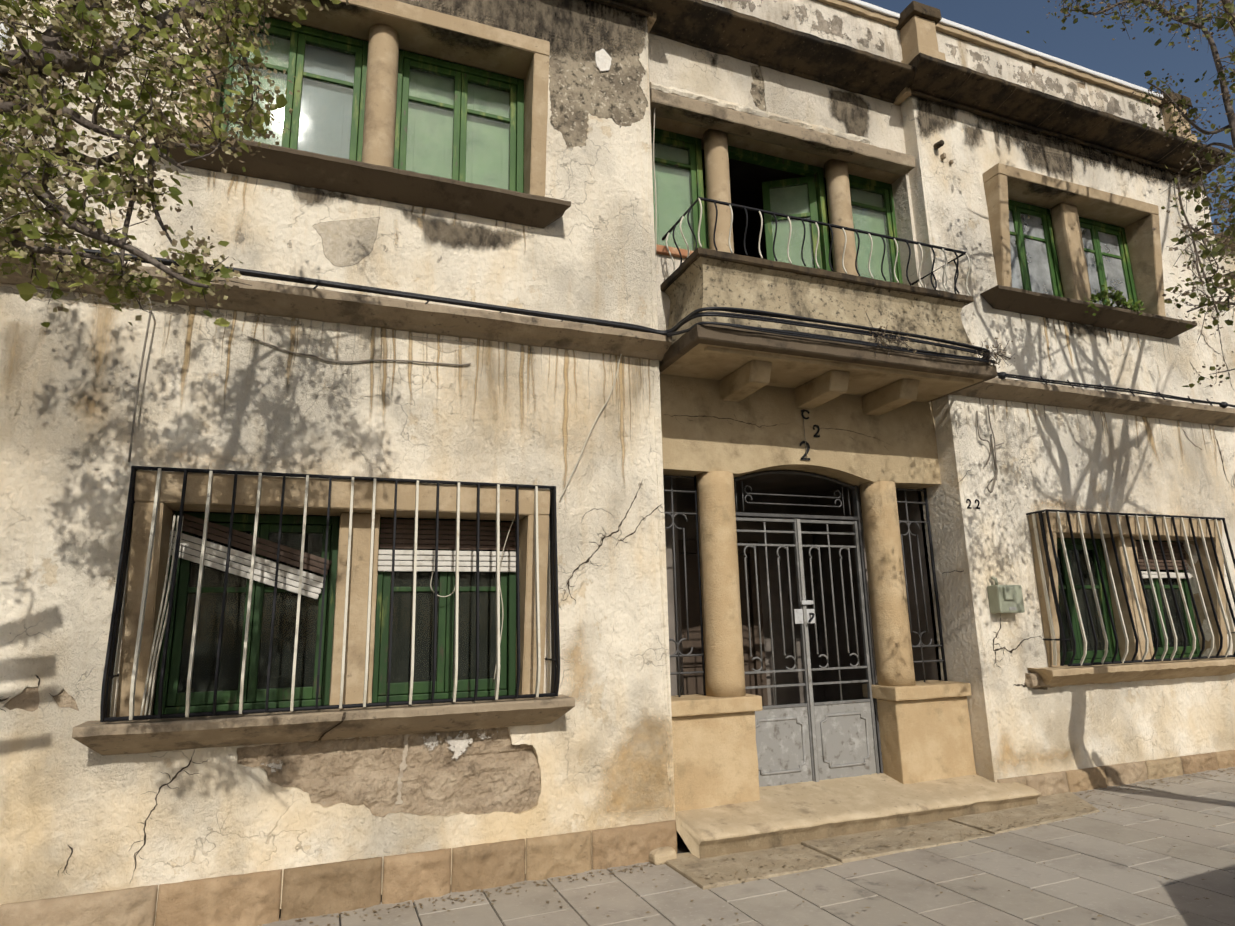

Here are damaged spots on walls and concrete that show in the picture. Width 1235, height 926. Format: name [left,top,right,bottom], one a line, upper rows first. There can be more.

peeling [549,24,653,169]
peeling [750,66,766,111]
water stain [293,185,349,205]
water stain [403,209,522,249]
crack [559,480,666,608]
spalling [5,686,79,712]
crack [130,752,206,882]
spalling [237,727,541,818]